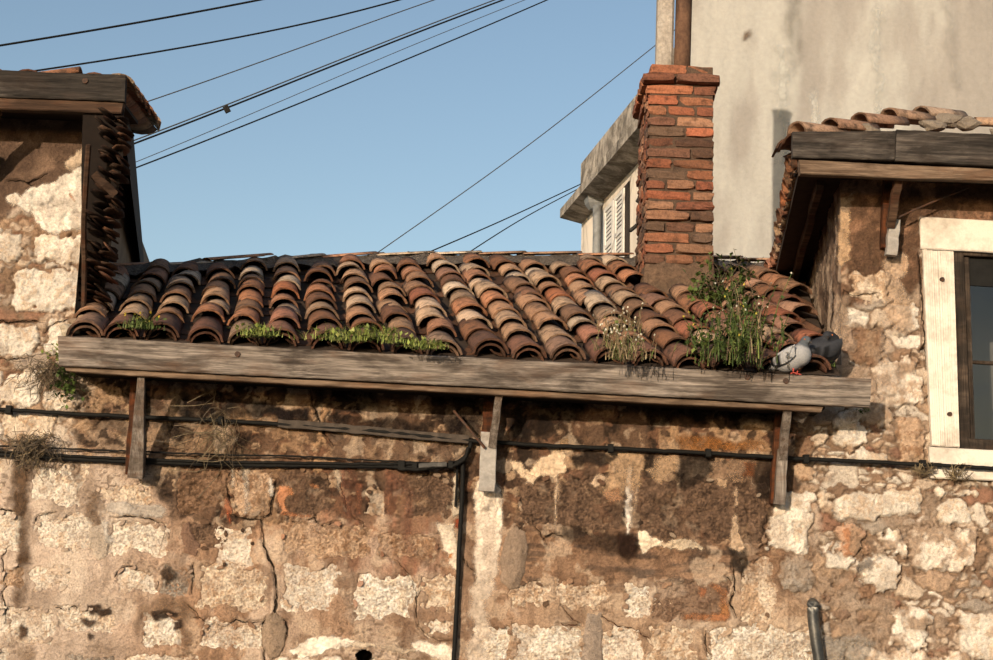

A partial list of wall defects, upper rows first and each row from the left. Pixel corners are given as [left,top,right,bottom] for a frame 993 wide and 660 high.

flaking render [6,149,82,234]
damp [14,442,31,567]
crack [187,474,364,660]
spalling [508,438,823,660]
peeling [857,558,873,572]
spalling [473,622,585,660]